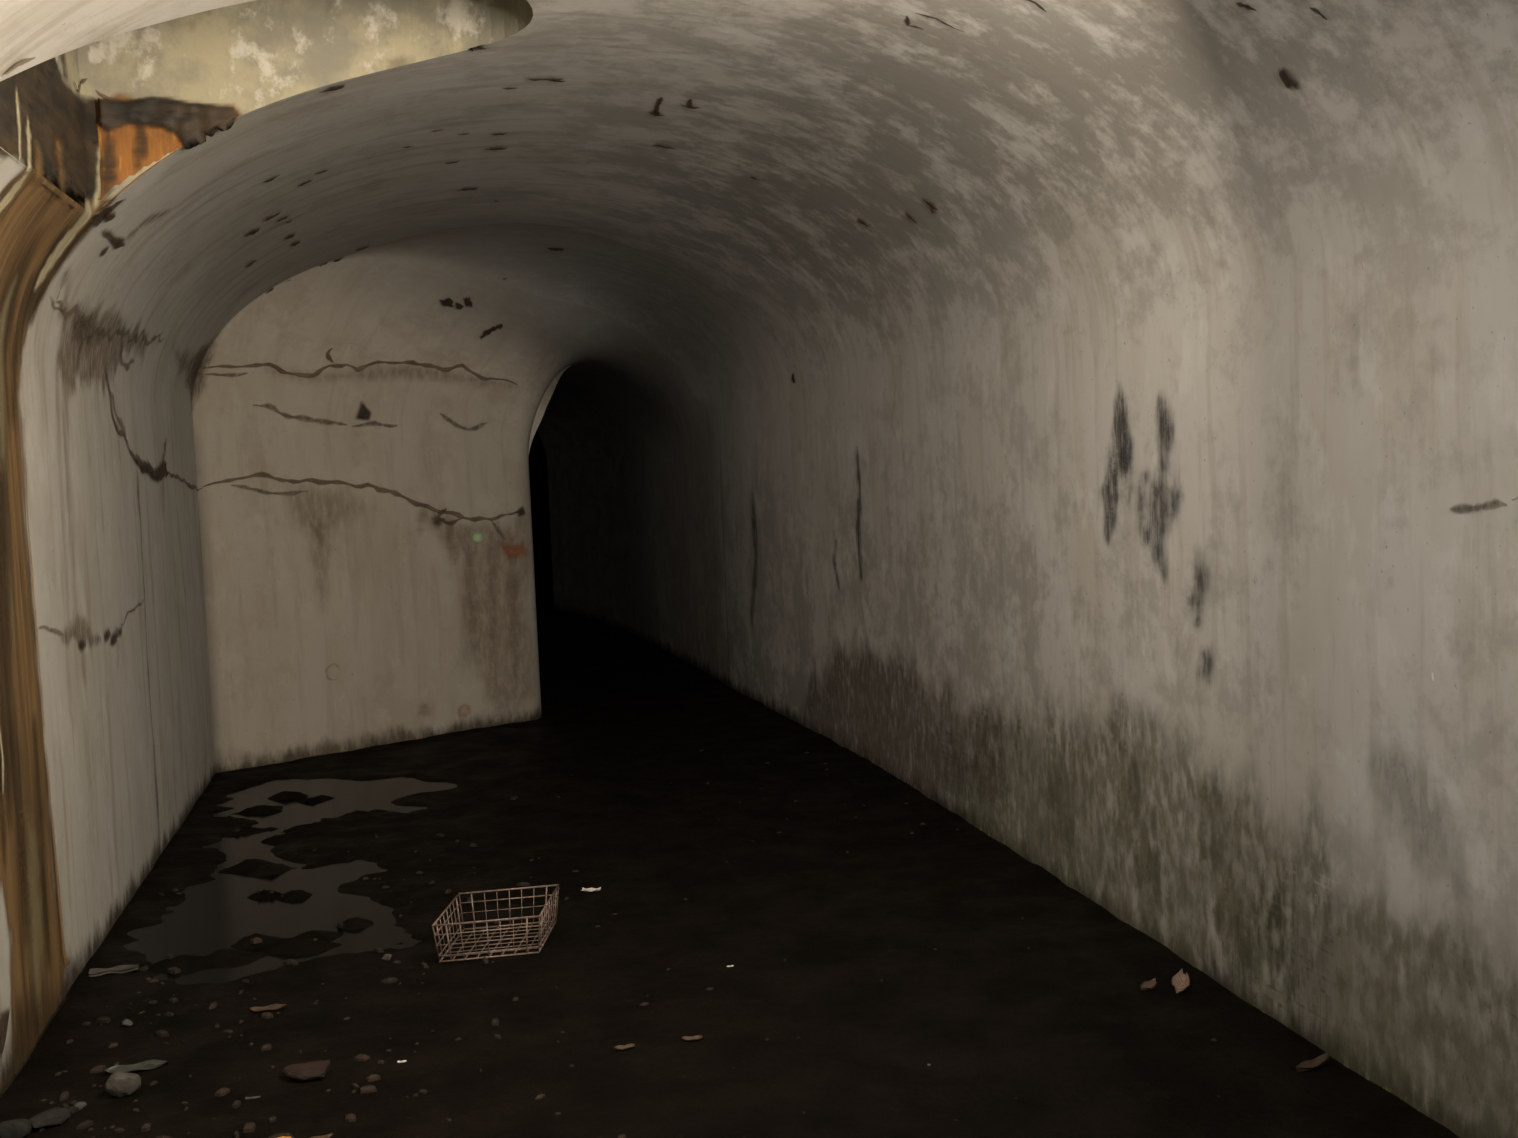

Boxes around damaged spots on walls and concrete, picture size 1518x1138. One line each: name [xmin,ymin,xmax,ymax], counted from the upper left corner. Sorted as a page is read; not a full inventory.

corrosion [0,96,240,1094]
crack [106,348,525,852]
crack [1452,500,1506,512]